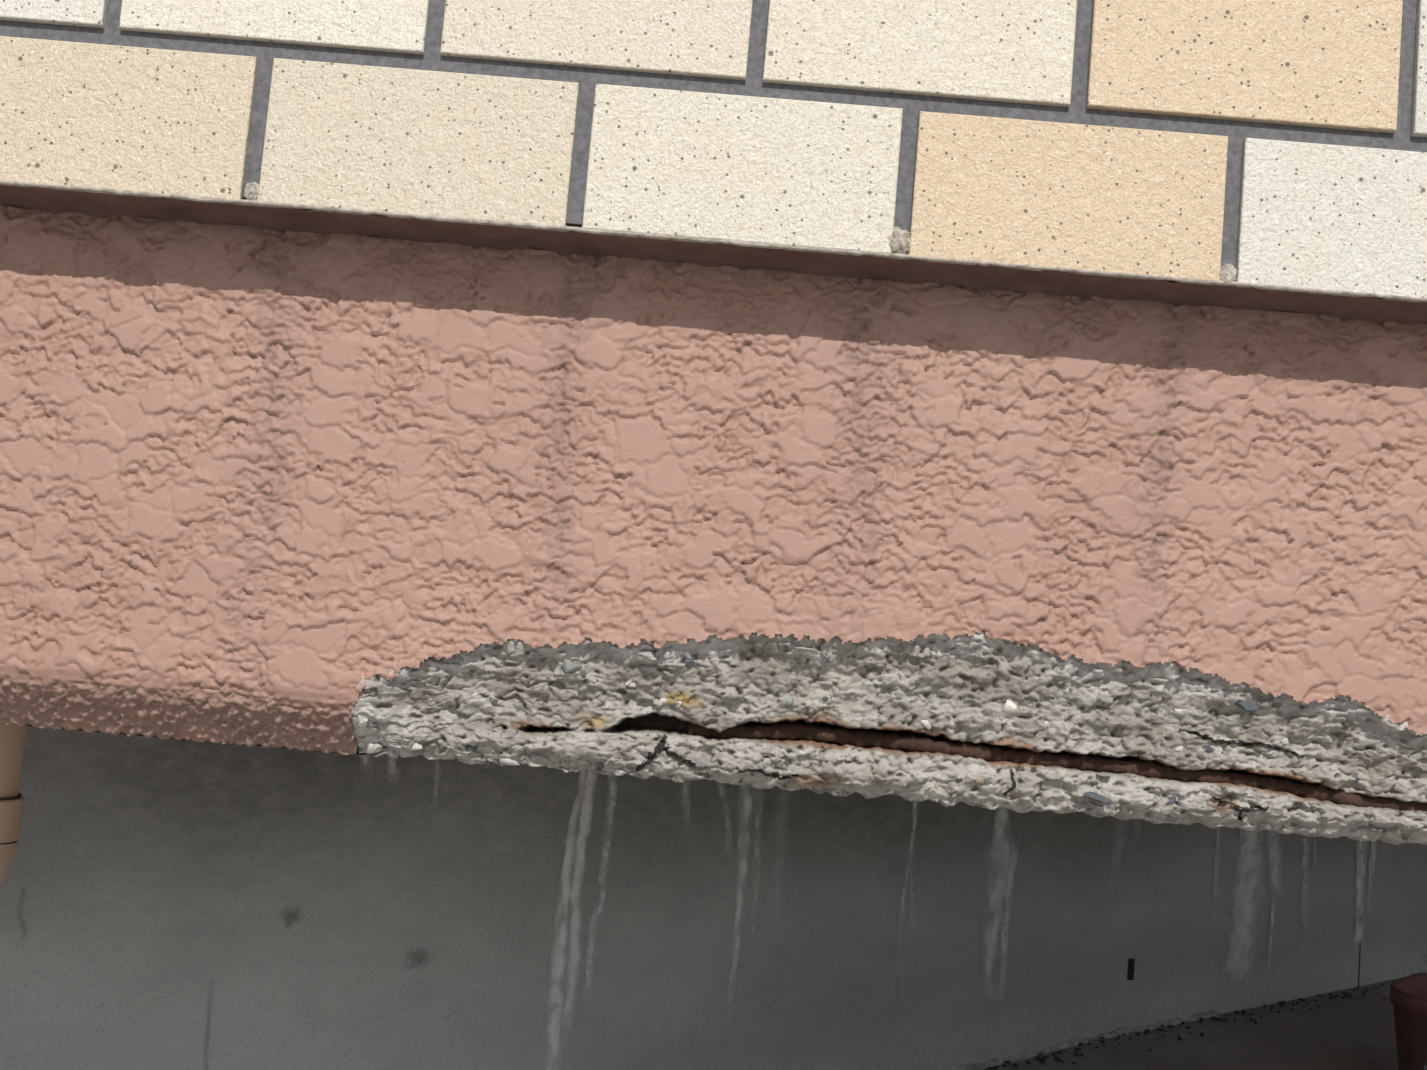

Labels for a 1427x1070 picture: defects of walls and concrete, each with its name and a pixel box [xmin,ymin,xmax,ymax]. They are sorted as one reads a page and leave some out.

crack [635,730,696,772]
crack [736,769,800,780]
spalling [344,631,1427,845]
corrosion [769,718,1074,769]
crack [1004,769,1016,796]
crack [1213,797,1269,822]
crack [1180,728,1304,758]
corrosion [1205,767,1336,809]
leakage [546,769,616,1070]
leakage [730,784,760,983]
leakage [984,807,1017,984]
leakage [1225,830,1279,980]